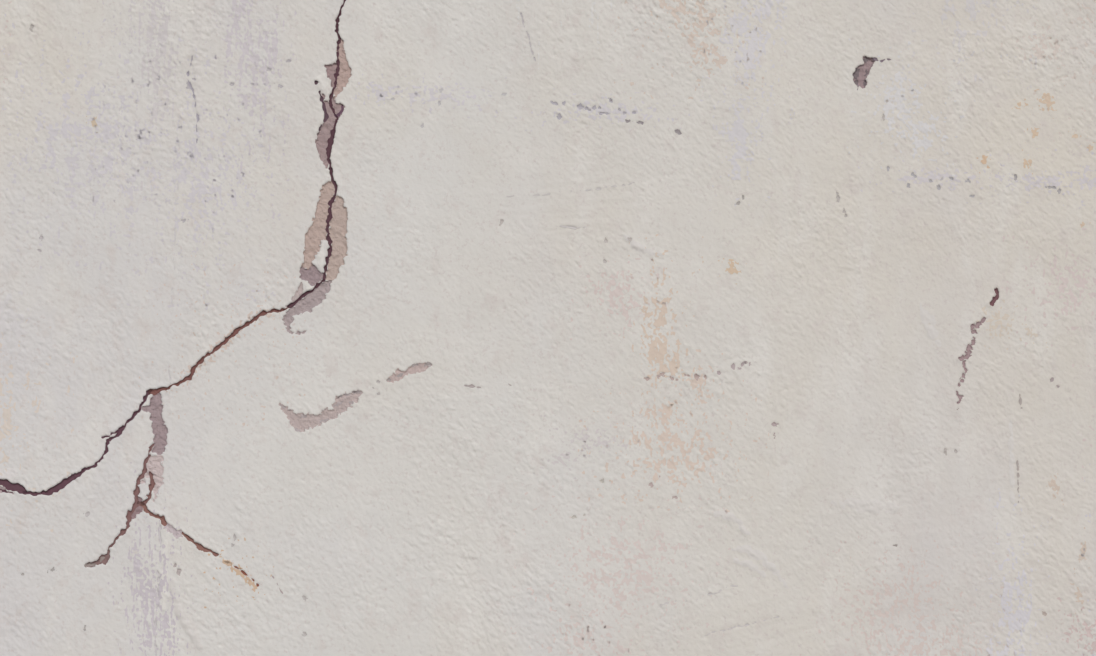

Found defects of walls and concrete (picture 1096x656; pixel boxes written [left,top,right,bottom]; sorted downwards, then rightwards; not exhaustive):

spalling [315,39,351,168]
spalling [853,56,875,89]
crack [0,0,346,496]
spalling [282,181,348,335]
spalling [131,392,168,519]
spalling [279,362,432,432]
crack [956,288,999,410]
crack [109,444,283,656]